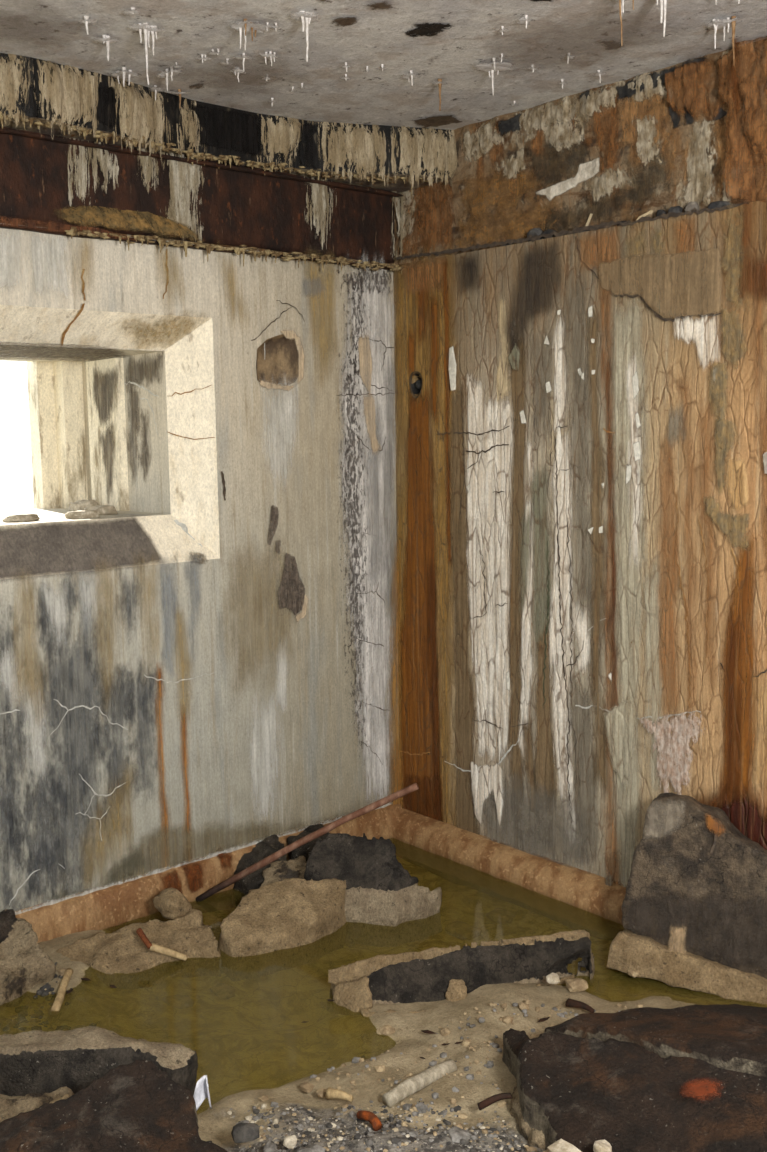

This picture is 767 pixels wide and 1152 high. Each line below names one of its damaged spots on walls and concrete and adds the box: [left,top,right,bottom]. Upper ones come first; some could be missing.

corrosion [0,217,134,240]
crack [61,269,86,346]
spalling [256,330,305,390]
leakage [414,71,673,248]
peeling [536,158,600,201]
crack [396,202,749,322]
peeling [268,505,308,621]
leakage [0,111,705,915]
corrosion [399,179,456,822]
crack [436,364,610,823]
corrosion [700,543,767,850]
leakage [626,893,767,971]